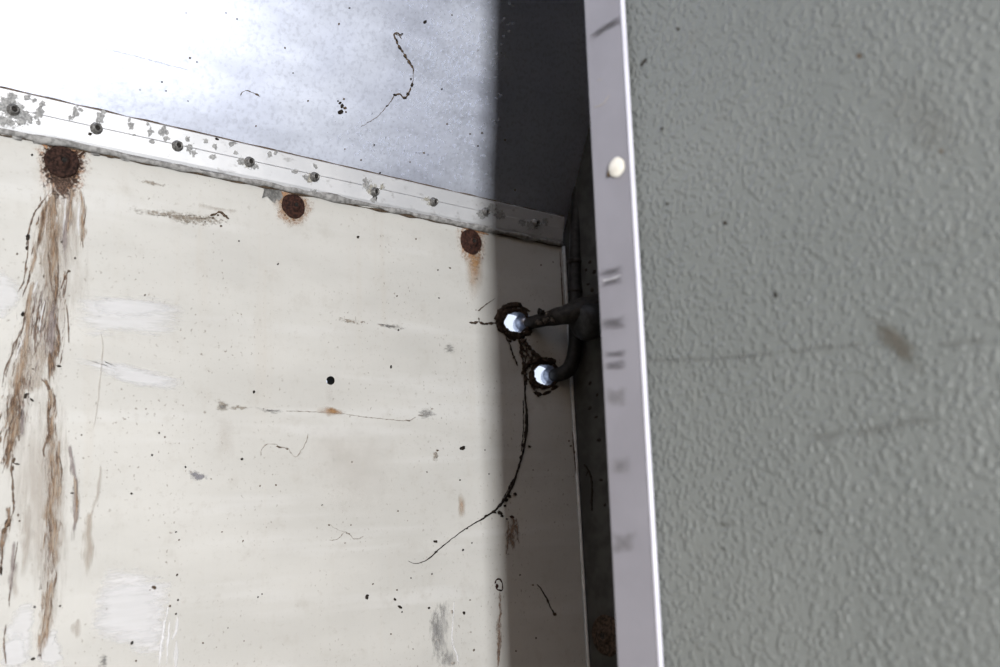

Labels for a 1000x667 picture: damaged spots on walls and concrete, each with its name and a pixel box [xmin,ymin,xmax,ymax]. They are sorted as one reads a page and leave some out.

rust [280,163,318,221]
rust [461,228,489,279]
rust [0,144,86,659]